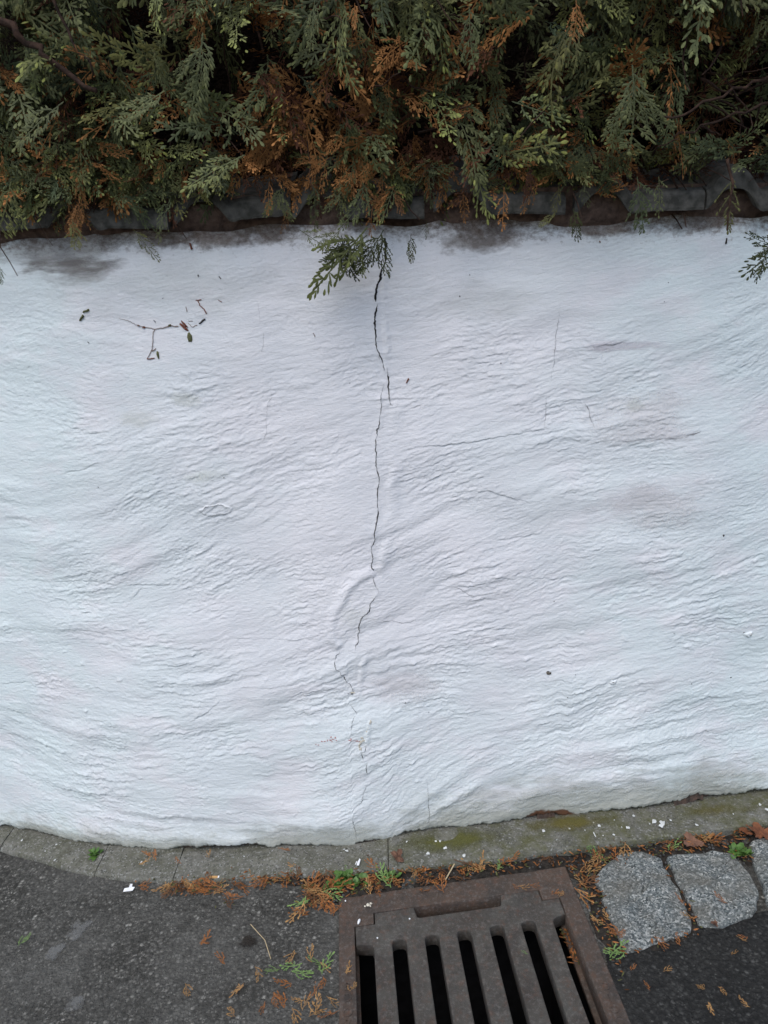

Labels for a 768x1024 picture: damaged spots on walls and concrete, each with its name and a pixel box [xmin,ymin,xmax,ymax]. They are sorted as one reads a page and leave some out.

crack [334,238,414,728]